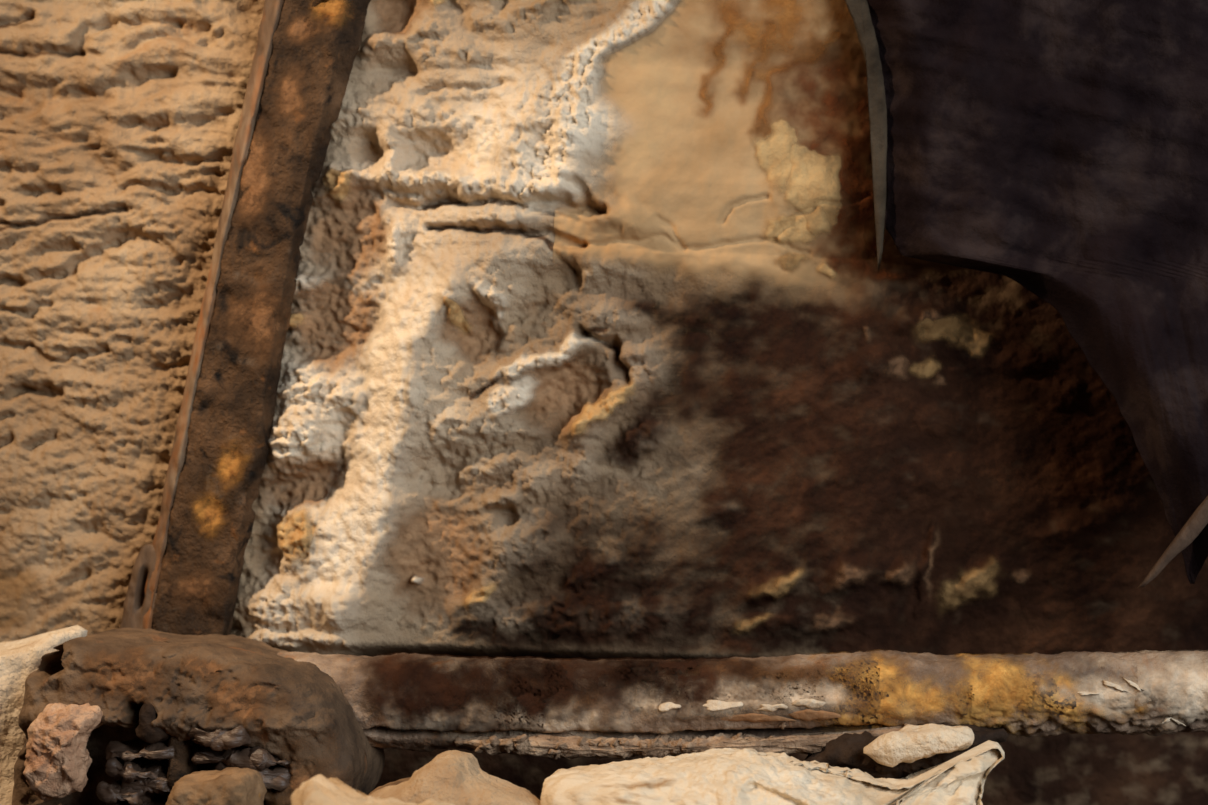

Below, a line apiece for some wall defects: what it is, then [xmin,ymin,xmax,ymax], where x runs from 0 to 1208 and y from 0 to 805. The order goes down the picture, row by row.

rust [288,0,344,41]
rust [279,77,303,114]
rust [239,137,270,217]
crack [423,202,576,273]
rust [231,271,291,352]
water stain [610,302,749,466]
rust [219,448,245,481]
rust [195,494,222,532]
rust [180,575,213,604]
water stain [454,578,642,647]
rust [551,692,598,714]
rust [687,654,1105,732]